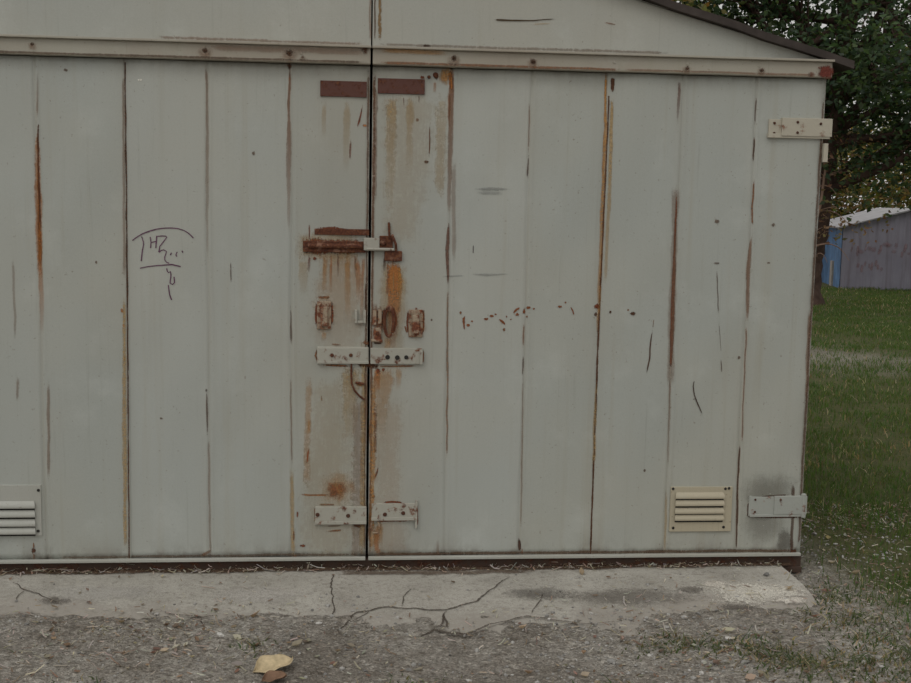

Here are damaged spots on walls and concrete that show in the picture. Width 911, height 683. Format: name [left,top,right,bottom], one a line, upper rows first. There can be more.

corrosion [0,44,801,575]
corrosion [801,139,822,494]
crack [330,575,614,636]